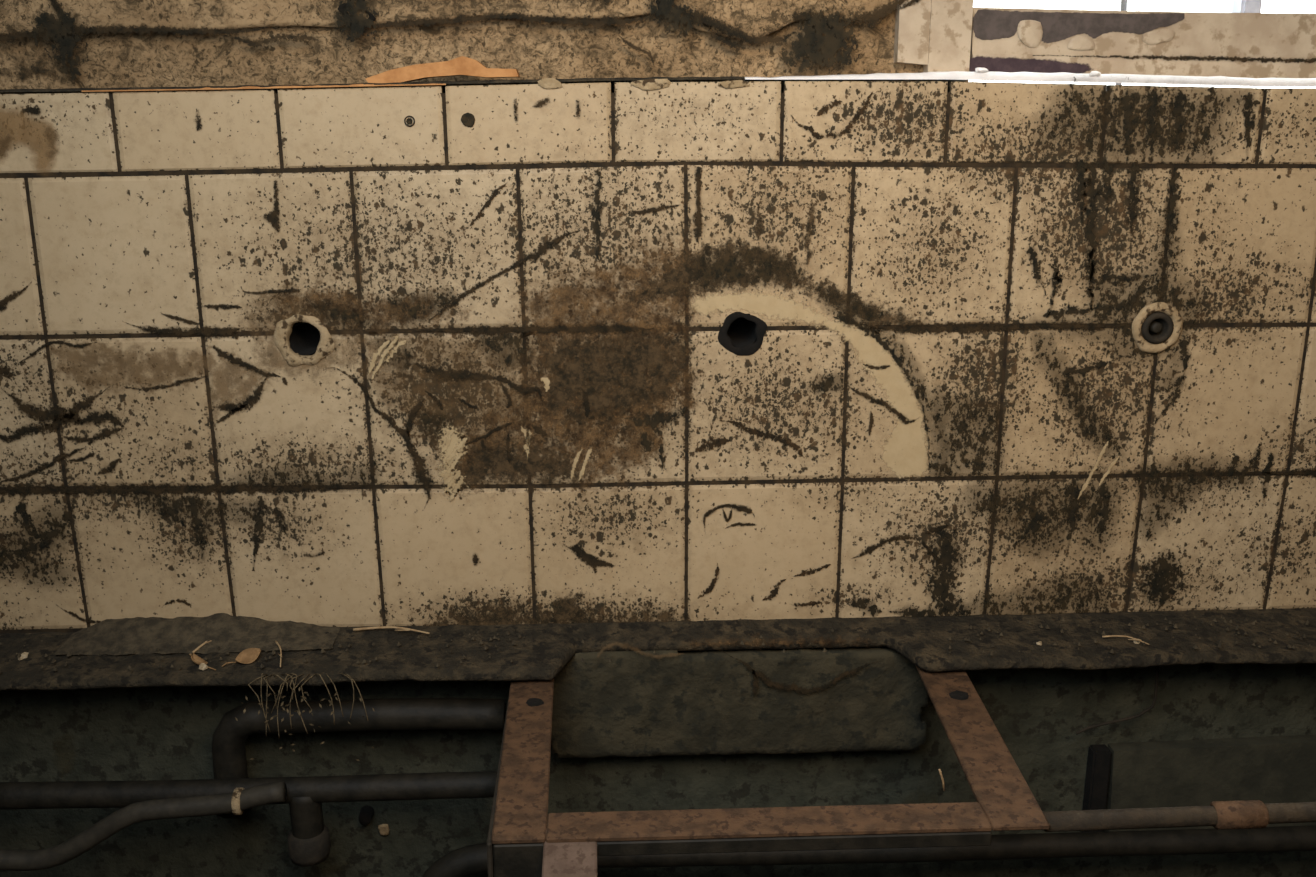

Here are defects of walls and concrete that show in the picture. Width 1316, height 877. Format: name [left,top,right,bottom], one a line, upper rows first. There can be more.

crack [0,0,920,65]
crack [0,286,301,482]
crack [331,363,547,509]
water stain [413,323,654,366]
crack [581,388,590,418]
water stain [624,77,1316,563]
water stain [0,461,376,591]
water stain [925,523,1111,617]
water stain [1138,548,1189,610]